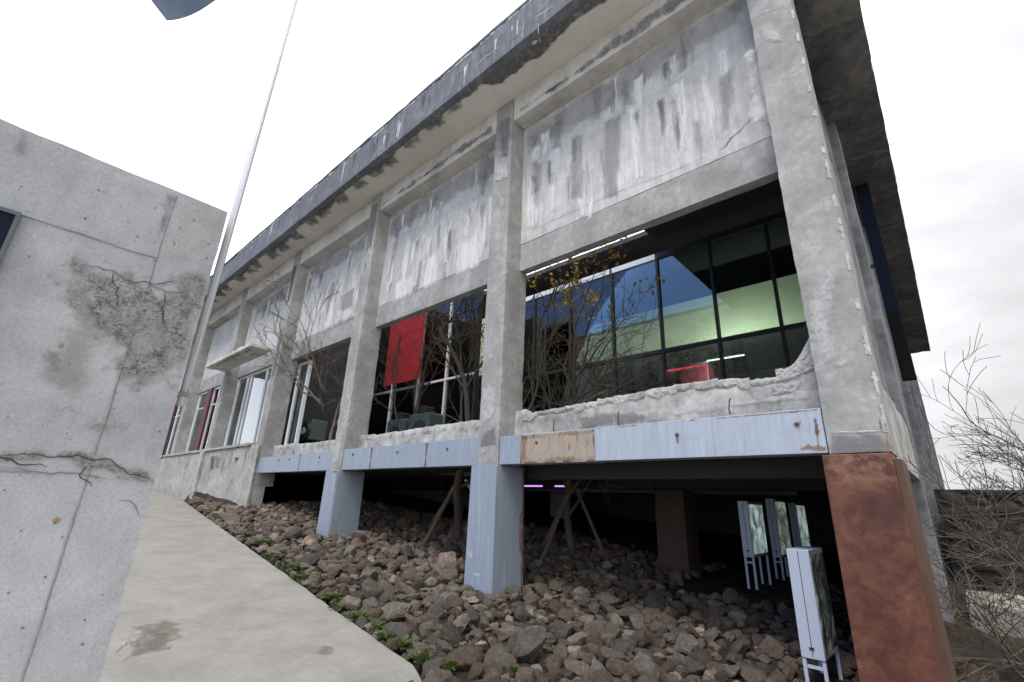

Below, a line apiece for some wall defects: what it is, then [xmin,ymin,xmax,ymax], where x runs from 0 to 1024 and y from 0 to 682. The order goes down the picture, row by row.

water stain [525,0,730,227]
water stain [386,118,510,301]
crack [83,264,187,325]
crack [0,453,154,486]
corrosion [519,428,599,590]
spalling [522,338,815,432]
corrosion [723,409,826,450]